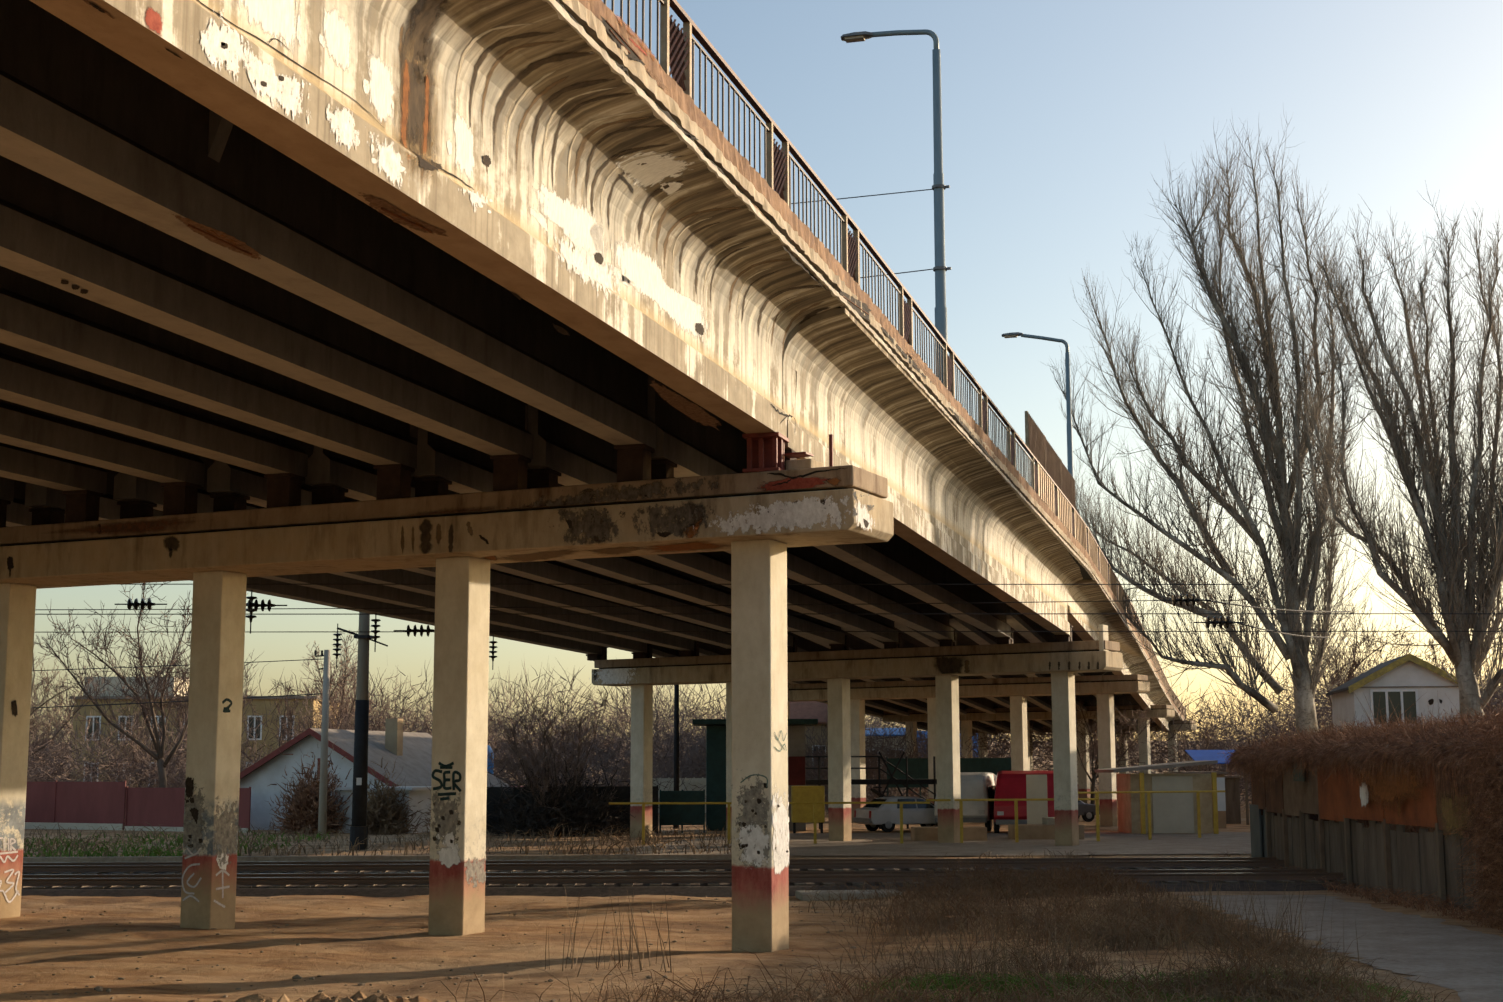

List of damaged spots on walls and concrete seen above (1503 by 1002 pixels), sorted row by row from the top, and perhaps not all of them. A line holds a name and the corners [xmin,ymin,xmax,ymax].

peeling [190,0,493,236]
rust [399,61,435,180]
leakage [399,0,447,158]
peeling [550,491,875,545]
peeling [183,777,239,871]
peeling [430,791,486,888]
peeling [732,776,789,874]